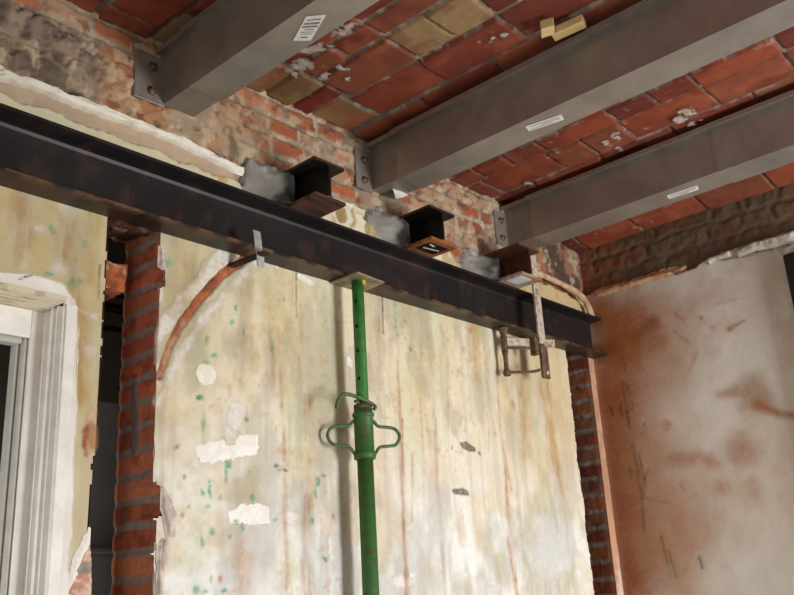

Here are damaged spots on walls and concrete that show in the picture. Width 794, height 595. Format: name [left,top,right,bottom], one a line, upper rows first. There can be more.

spalling [706,231,794,266]
spalling [593,265,687,298]
spalling [155,249,279,406]
peeling [195,401,259,464]
corrosion [594,302,644,589]
peeling [228,503,270,525]